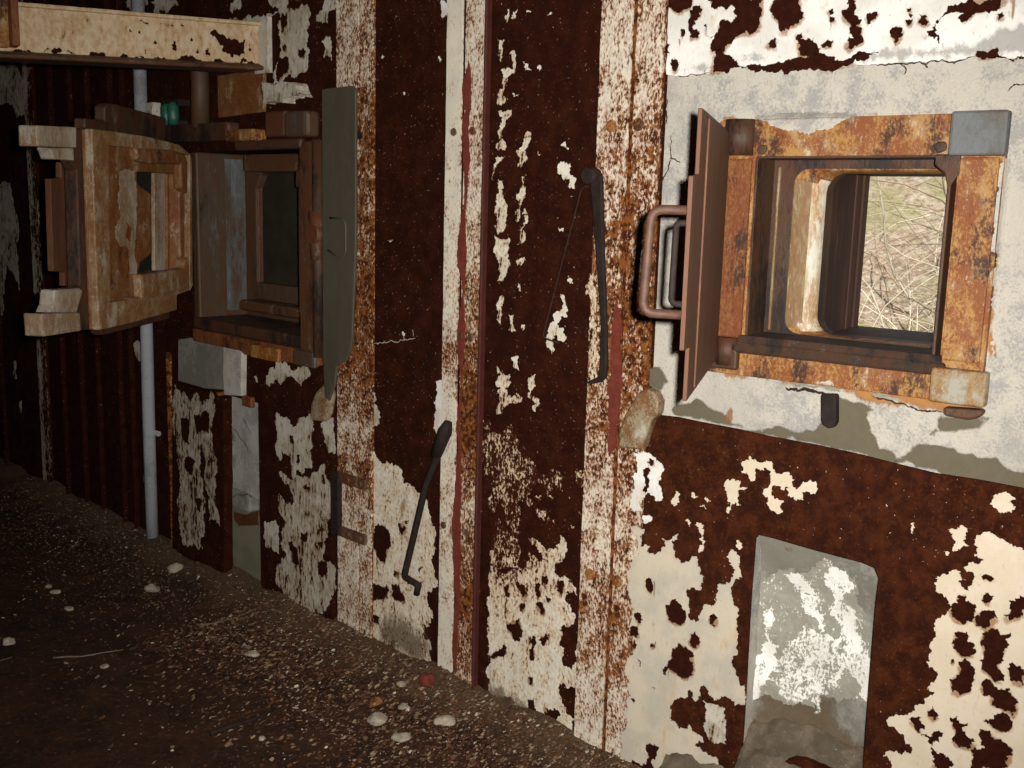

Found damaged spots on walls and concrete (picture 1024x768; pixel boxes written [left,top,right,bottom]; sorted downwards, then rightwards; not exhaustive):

rust [116,223,132,278]
peeling [172,385,220,550]
peeling [263,412,337,614]
peeling [373,452,438,661]
peeling [492,39,541,281]
peeling [482,356,584,730]
peeling [546,294,568,353]
peeling [557,142,576,189]
peeling [619,451,746,768]
peeling [724,456,818,514]
rust [836,388,977,412]
peeling [883,525,1024,768]